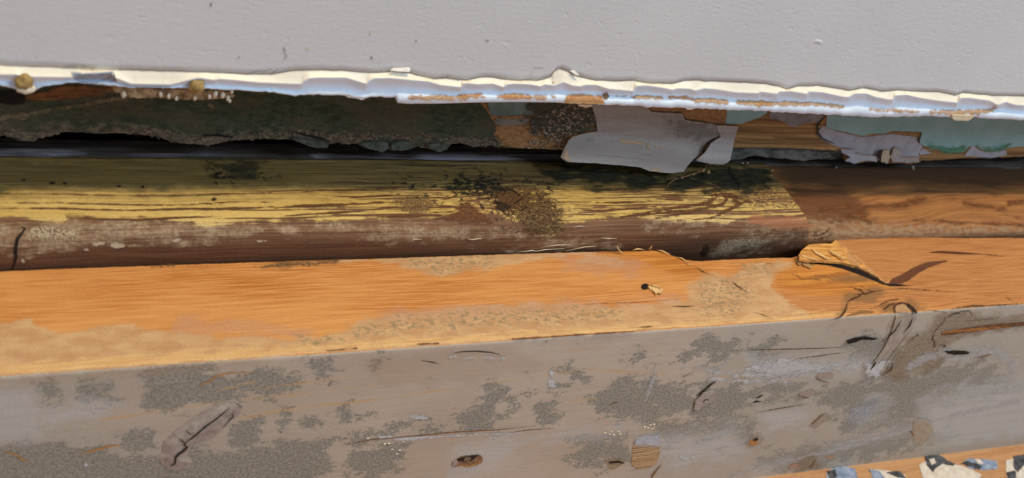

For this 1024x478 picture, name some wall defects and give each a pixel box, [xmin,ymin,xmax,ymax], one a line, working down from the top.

spalling [38,132,168,141]
damp [0,82,498,152]
damp [520,102,597,139]
peeling [481,102,1024,173]
crack [0,187,457,269]
damp [441,177,507,197]
crack [574,198,684,217]
crack [811,262,1024,348]
crack [171,403,241,467]